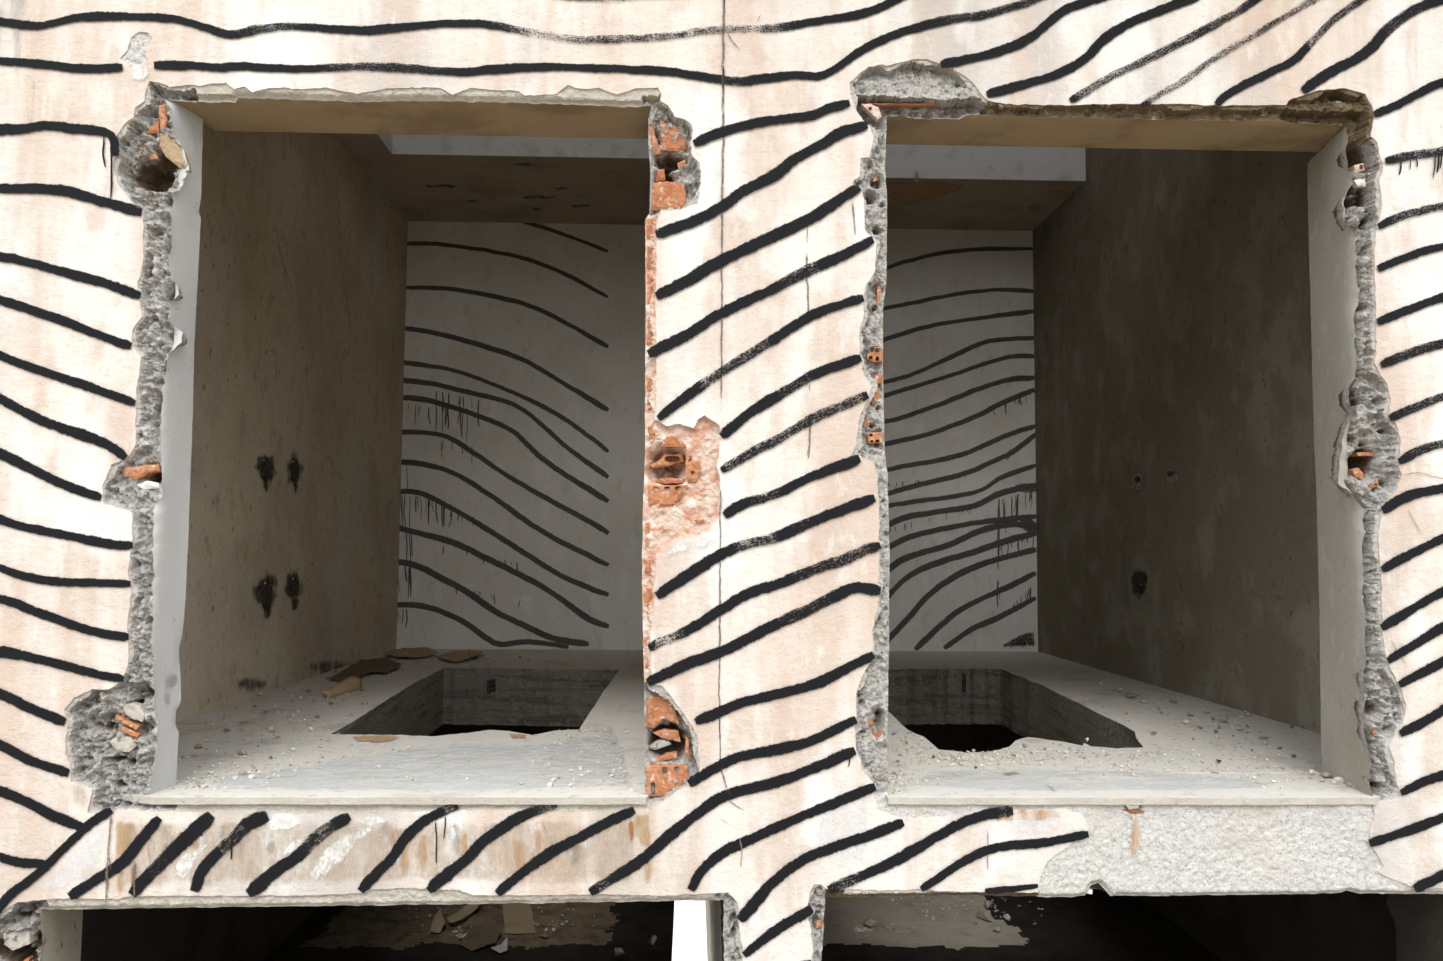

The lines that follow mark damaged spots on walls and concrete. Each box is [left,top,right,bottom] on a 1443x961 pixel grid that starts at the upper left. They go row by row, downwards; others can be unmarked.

flaking render [0,32,743,961]
crack [718,491,743,866]
flaking render [807,59,1443,961]